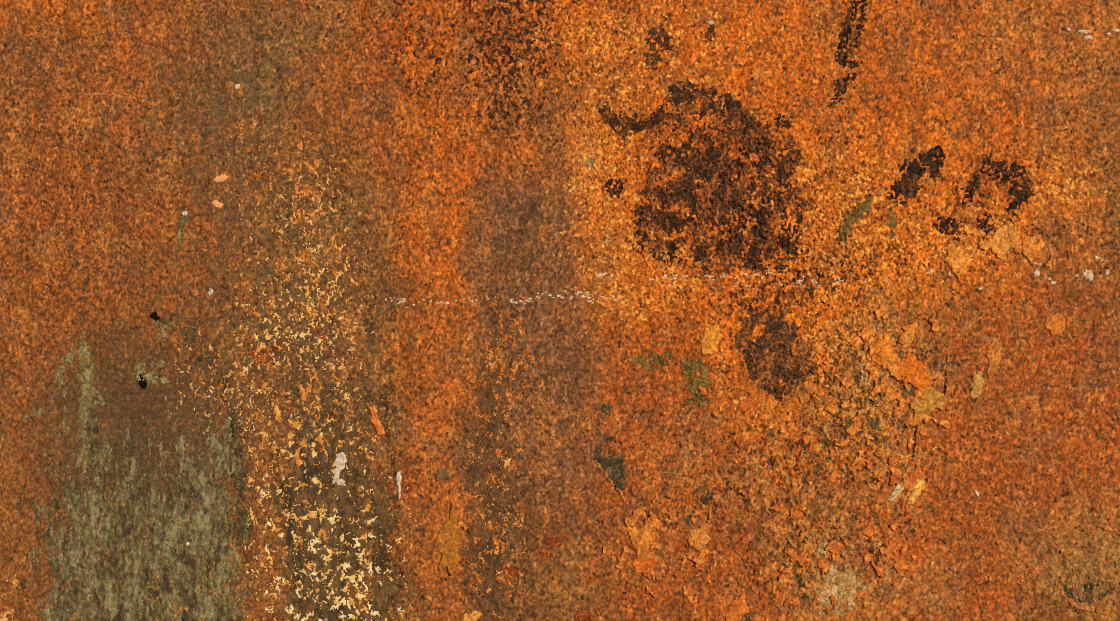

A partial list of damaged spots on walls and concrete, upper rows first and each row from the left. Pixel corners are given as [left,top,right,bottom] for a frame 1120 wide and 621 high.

corrosion [643,24,674,70]
corrosion [384,0,568,142]
corrosion [933,155,1052,279]
corrosion [593,81,950,604]
corrosion [1045,313,1066,335]
peeling [161,121,418,621]
corrosion [970,334,1002,399]
corrosion [368,406,385,436]
corrosion [434,468,451,482]
spalling [684,490,717,525]
corrosion [462,610,482,621]
corrosion [723,592,750,621]